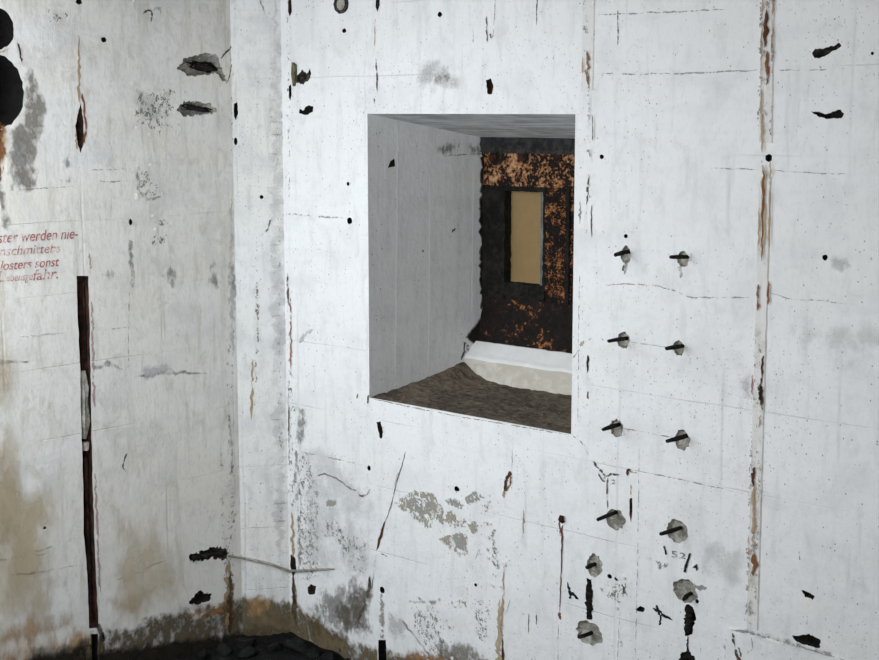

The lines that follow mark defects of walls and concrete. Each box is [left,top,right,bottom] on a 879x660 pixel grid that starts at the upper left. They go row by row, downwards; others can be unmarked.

water stain [9,73,46,191]
corrosion [75,38,87,149]
spalling [177,52,234,83]
corrosion [757,0,774,152]
corrosion [758,161,772,260]
water stain [294,410,305,481]
crack [376,451,406,557]
peeling [395,490,506,588]
corrosion [745,441,760,627]
water stain [25,578,480,660]